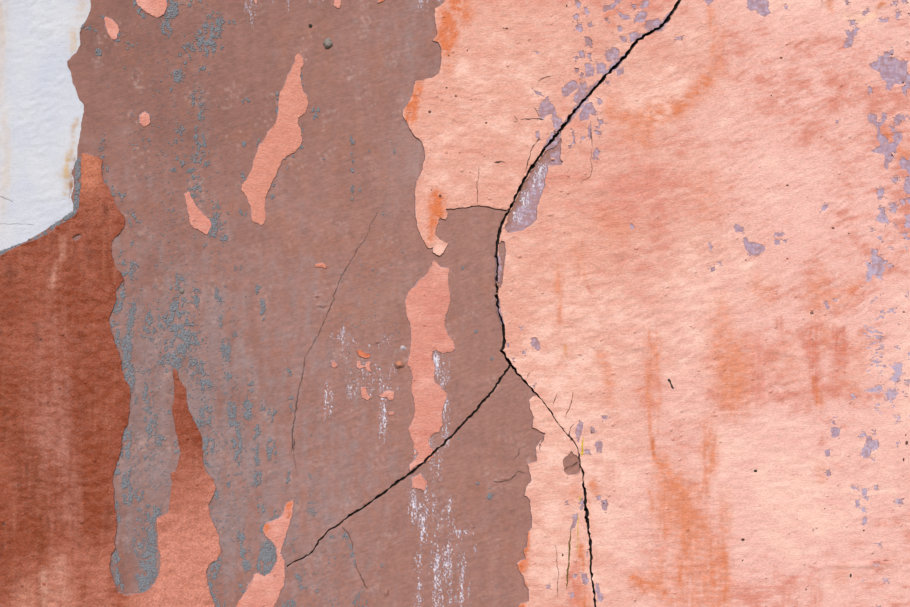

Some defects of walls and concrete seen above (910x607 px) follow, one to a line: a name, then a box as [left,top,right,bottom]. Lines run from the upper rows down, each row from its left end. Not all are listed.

spalling [747,0,770,17]
spalling [843,0,910,48]
spalling [869,47,910,96]
spalling [865,113,910,282]
spalling [734,225,787,261]
peeling [0,0,681,607]
crack [287,0,680,607]